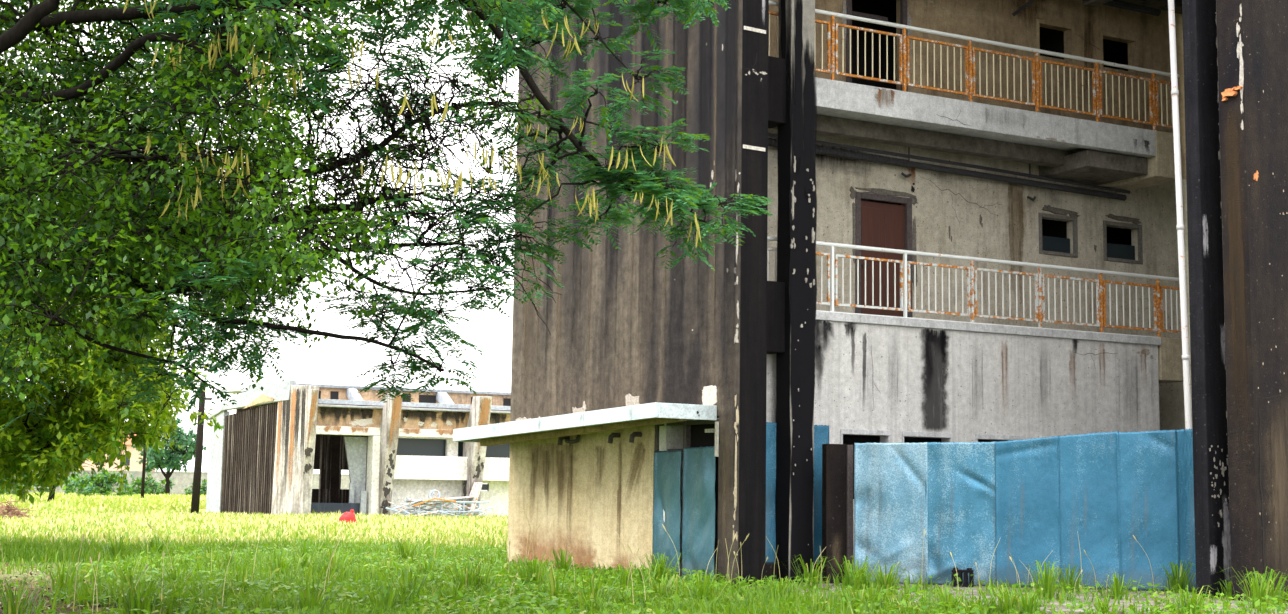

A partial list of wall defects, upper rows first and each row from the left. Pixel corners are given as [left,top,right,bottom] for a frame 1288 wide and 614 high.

spalling [1218,4,1264,160]
peeling [791,156,815,252]
damp [815,320,867,389]
damp [922,329,949,431]
damp [532,444,572,494]
peeling [1209,411,1229,527]